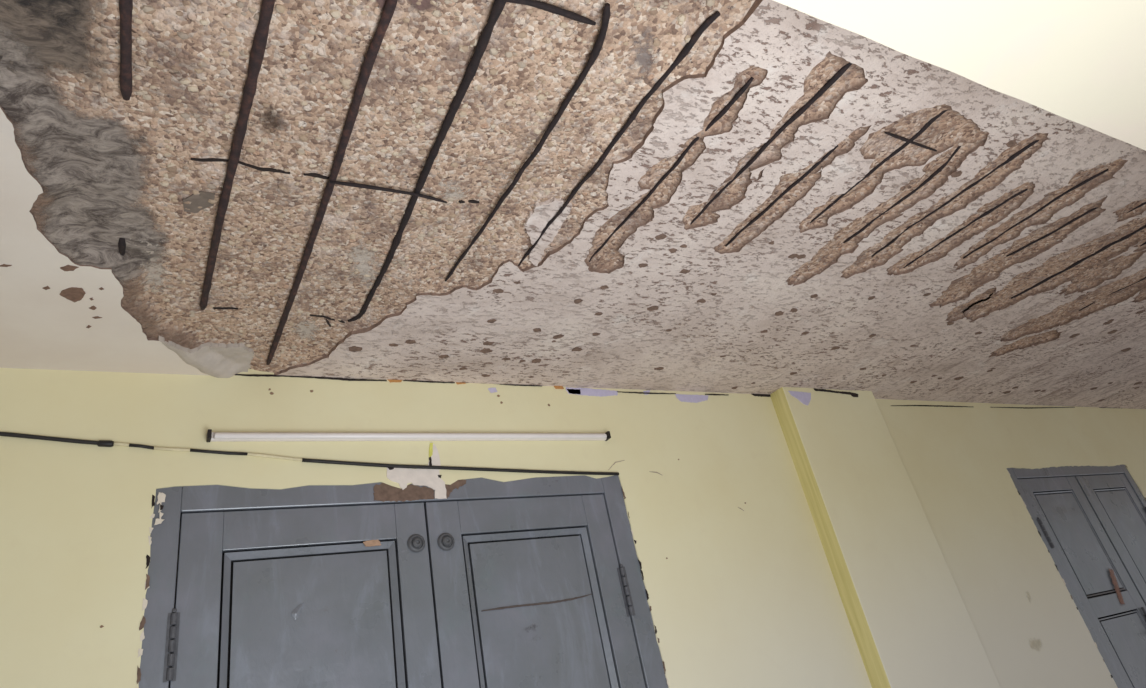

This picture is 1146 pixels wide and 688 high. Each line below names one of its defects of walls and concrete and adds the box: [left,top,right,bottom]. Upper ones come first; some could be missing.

spalling [0,0,1146,409]
peeling [373,479,467,502]